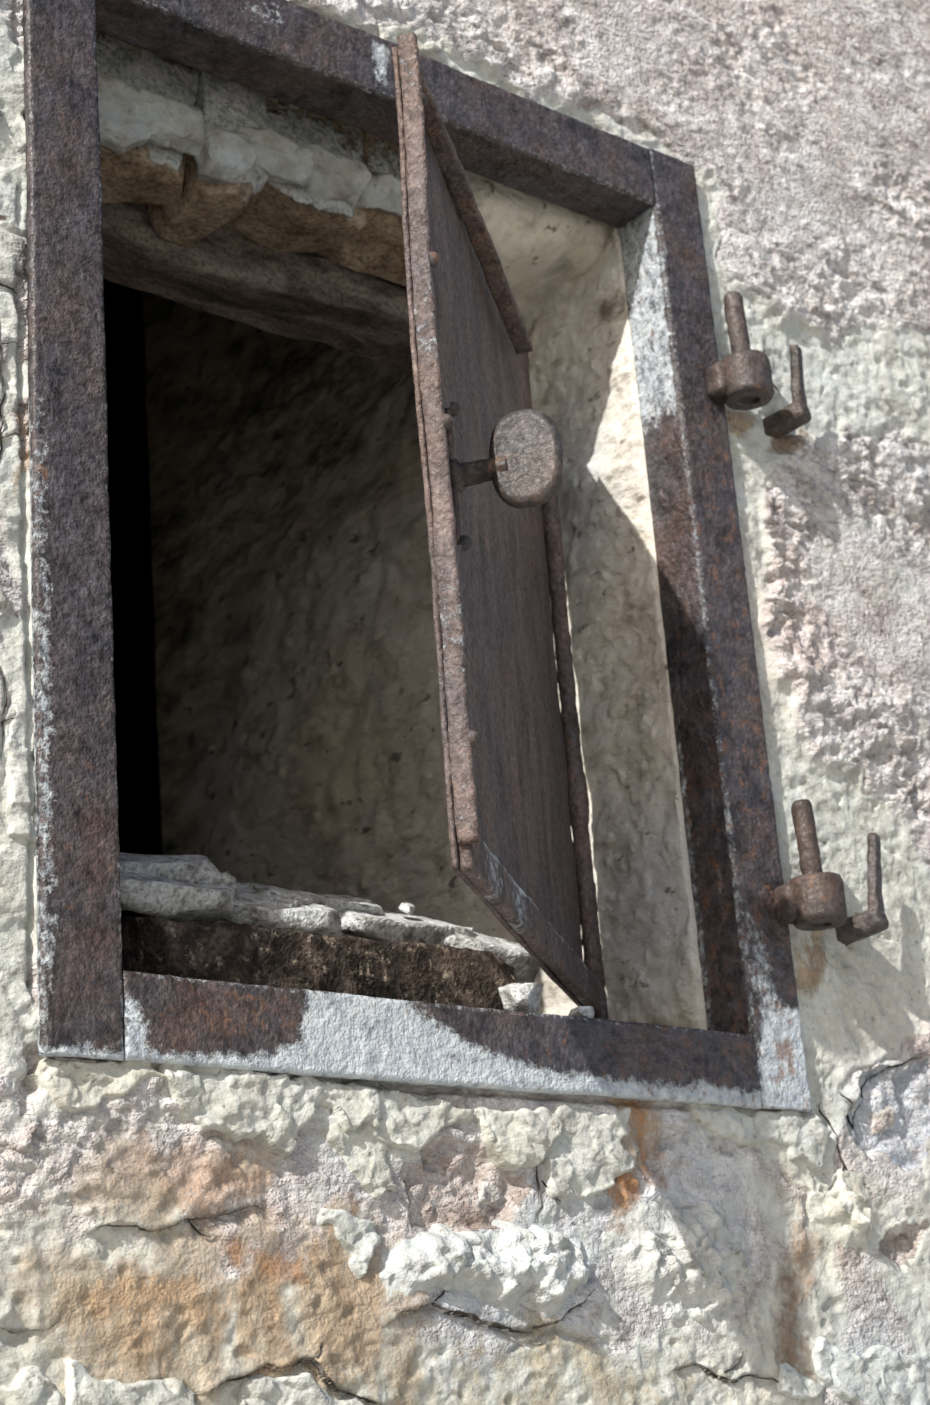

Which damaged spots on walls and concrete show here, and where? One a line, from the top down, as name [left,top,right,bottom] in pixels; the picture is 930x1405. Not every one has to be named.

crack [0,341,24,459]
corrosion [772,431,808,454]
crack [0,667,15,754]
crack [818,1055,930,1174]
crack [83,1206,264,1237]
crack [384,1289,595,1333]